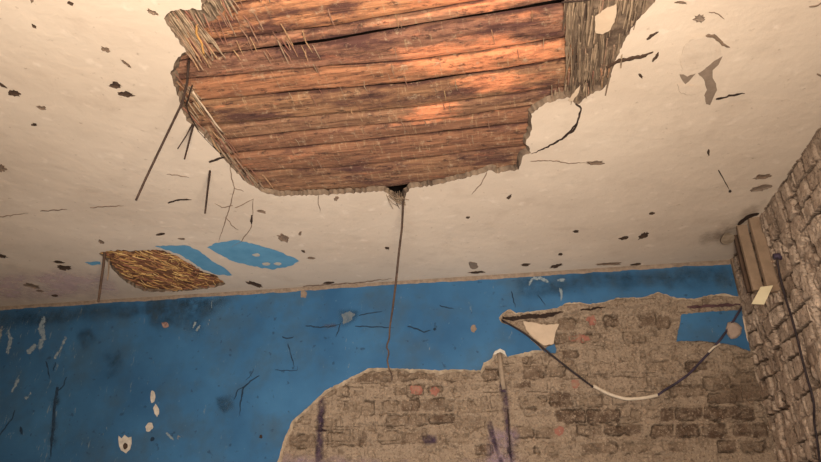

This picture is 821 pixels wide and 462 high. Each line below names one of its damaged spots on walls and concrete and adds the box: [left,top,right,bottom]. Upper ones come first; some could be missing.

flaking render [109,81,135,98]
spalling [147,0,655,209]
crack [531,103,582,164]
crack [209,157,253,247]
flaking render [118,435,132,453]
flaking render [145,391,159,441]
crack [234,311,430,415]
flaking render [277,292,779,462]